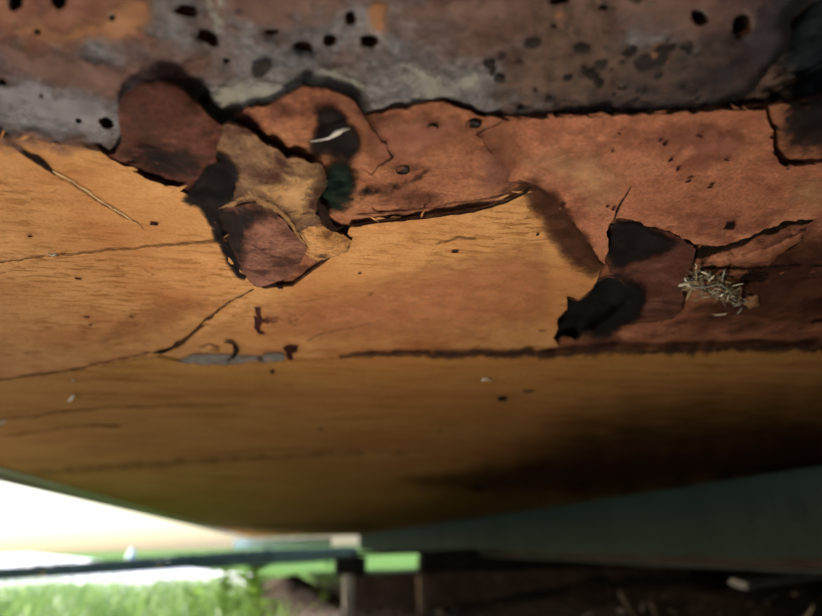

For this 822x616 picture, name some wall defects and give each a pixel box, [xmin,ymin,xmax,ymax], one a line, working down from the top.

leakage [487,0,814,115]
leakage [211,68,366,113]
leakage [398,62,480,100]
leakage [0,77,109,154]
peeling [742,294,760,308]
crack [0,284,283,381]
peeling [179,344,285,366]
crack [0,403,248,436]